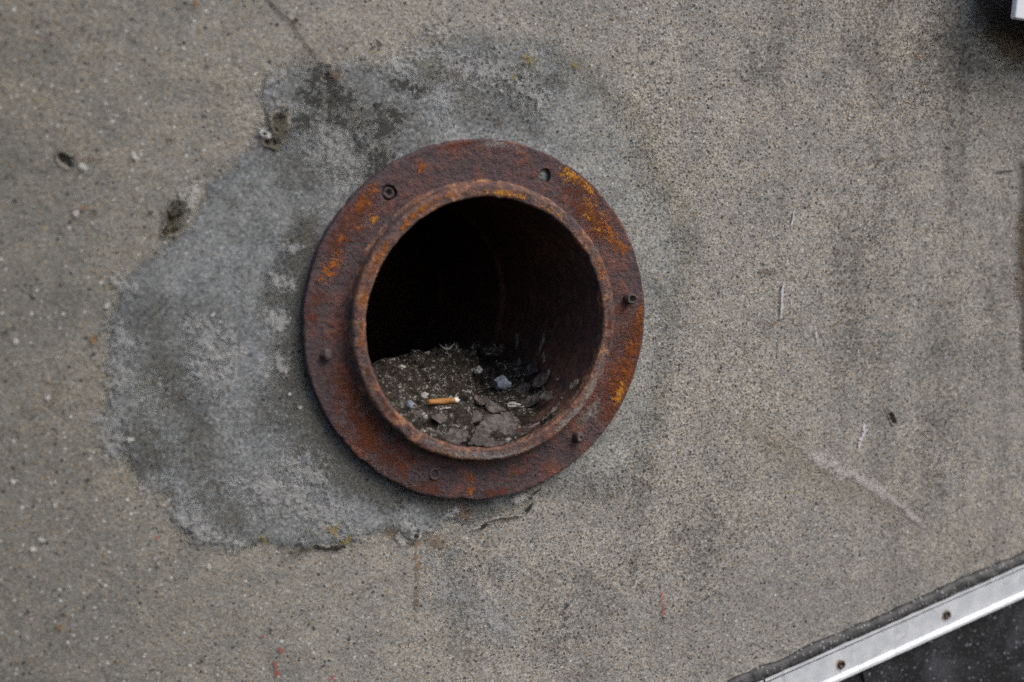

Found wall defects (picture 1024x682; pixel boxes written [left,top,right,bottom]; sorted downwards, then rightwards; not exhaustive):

damp [265,18,565,200]
corrosion [306,180,382,322]
corrosion [371,191,454,272]
corrosion [542,166,630,285]
corrosion [379,394,531,459]
corrosion [513,303,643,432]